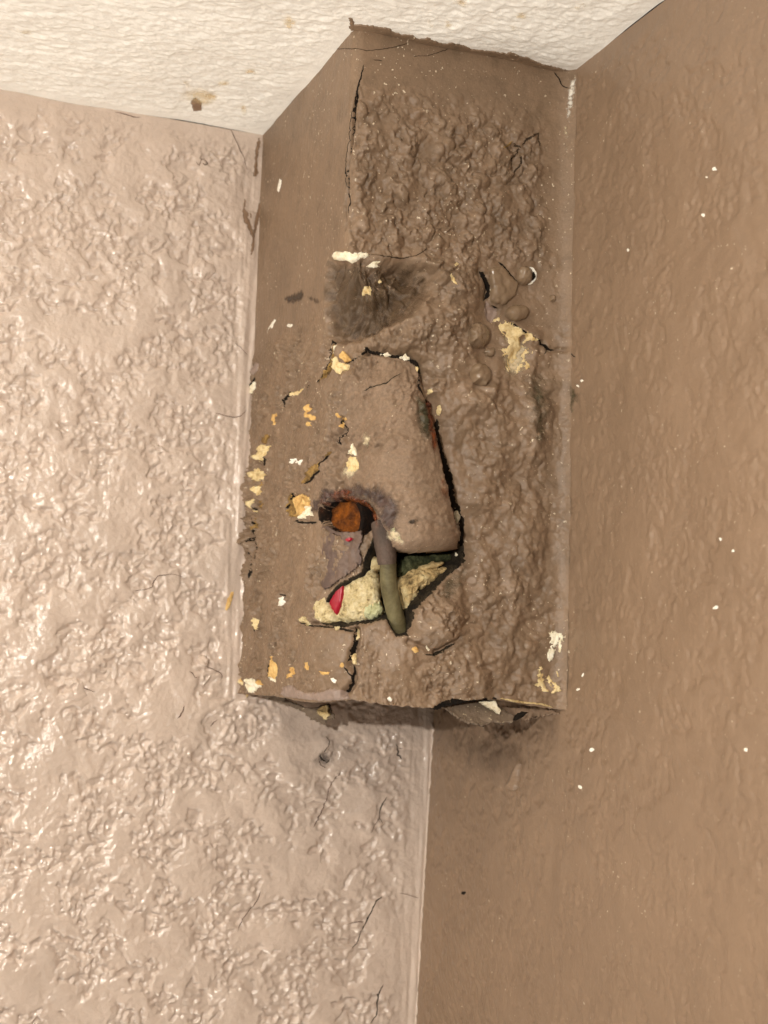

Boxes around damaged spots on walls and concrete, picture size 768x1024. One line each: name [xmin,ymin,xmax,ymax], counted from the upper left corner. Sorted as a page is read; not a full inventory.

crack [338,43,447,213]
spalling [331,345,351,375]
spalling [484,266,539,374]
spalling [303,404,316,426]
spalling [344,437,369,475]
crack [282,340,465,557]
rust [311,485,397,531]
spalling [285,493,466,653]
crack [301,622,360,692]
peeling [442,630,564,727]